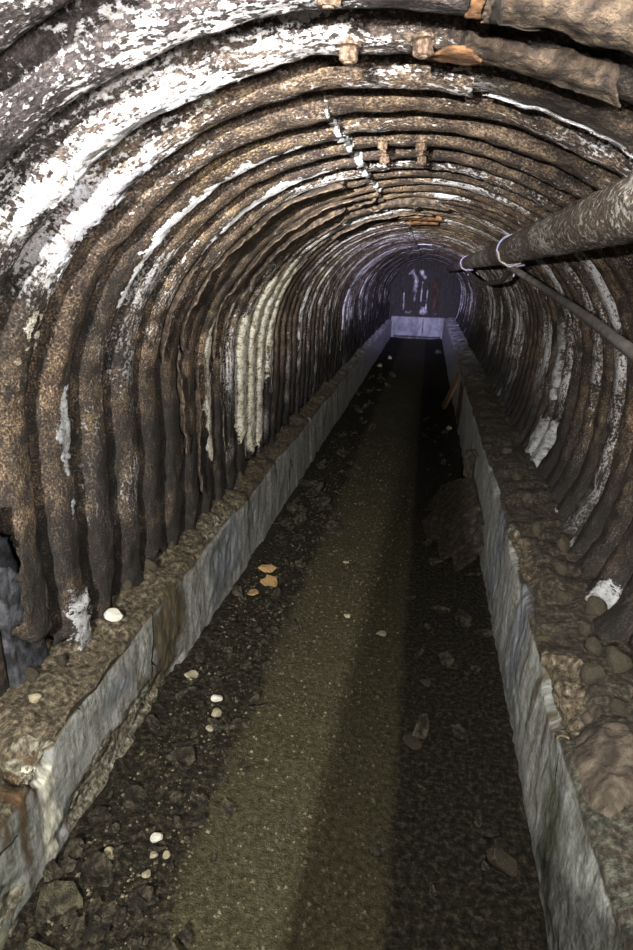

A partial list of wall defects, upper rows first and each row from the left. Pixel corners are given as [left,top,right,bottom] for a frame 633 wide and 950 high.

leakage [324,109,381,192]